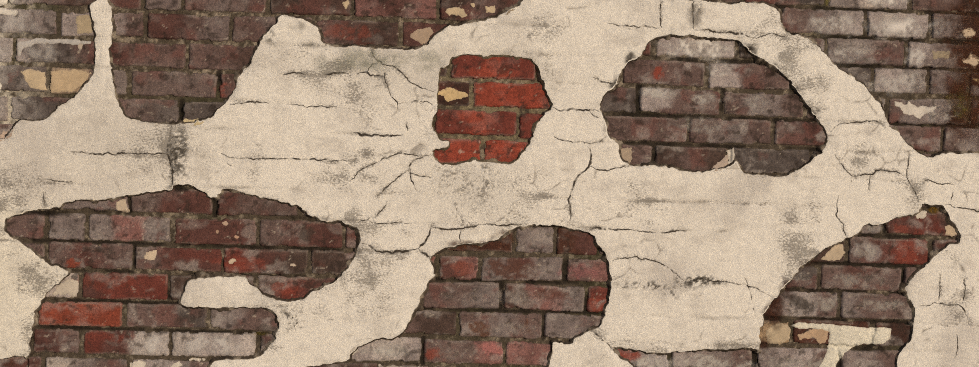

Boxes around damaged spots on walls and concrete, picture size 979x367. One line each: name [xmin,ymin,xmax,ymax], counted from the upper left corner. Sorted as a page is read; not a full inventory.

spalling [0,184,361,367]
spalling [0,0,523,141]
crack [227,53,515,257]
spalling [307,224,612,367]
spalling [432,54,553,166]
crack [555,137,624,219]
crack [596,226,679,234]
crack [620,256,759,310]
spalling [600,34,828,177]
spalling [613,204,961,367]
spalling [689,0,979,158]
crack [842,157,979,212]